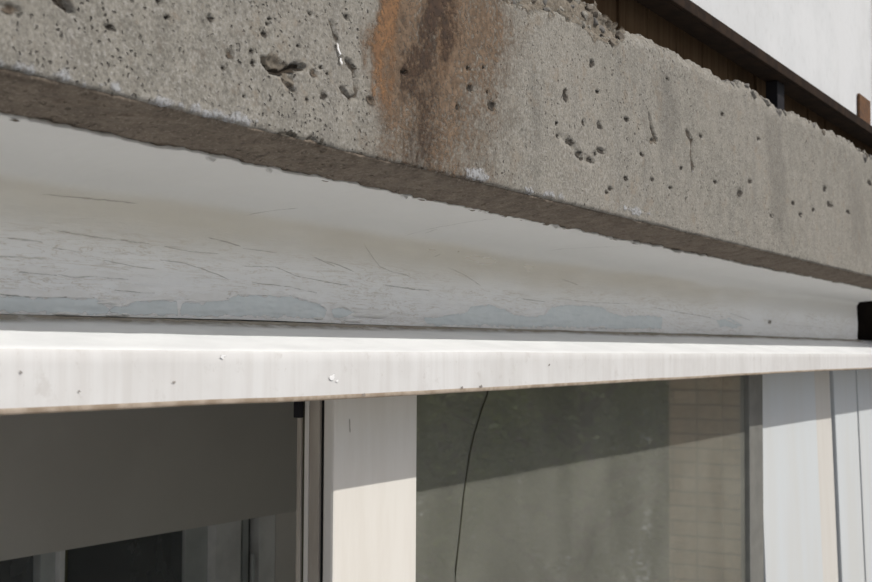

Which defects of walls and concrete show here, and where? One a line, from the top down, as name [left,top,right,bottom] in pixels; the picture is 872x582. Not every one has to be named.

spalling [505,0,626,47]
corrosion [366,0,513,182]
peeling [0,289,327,320]
peeling [421,301,662,330]